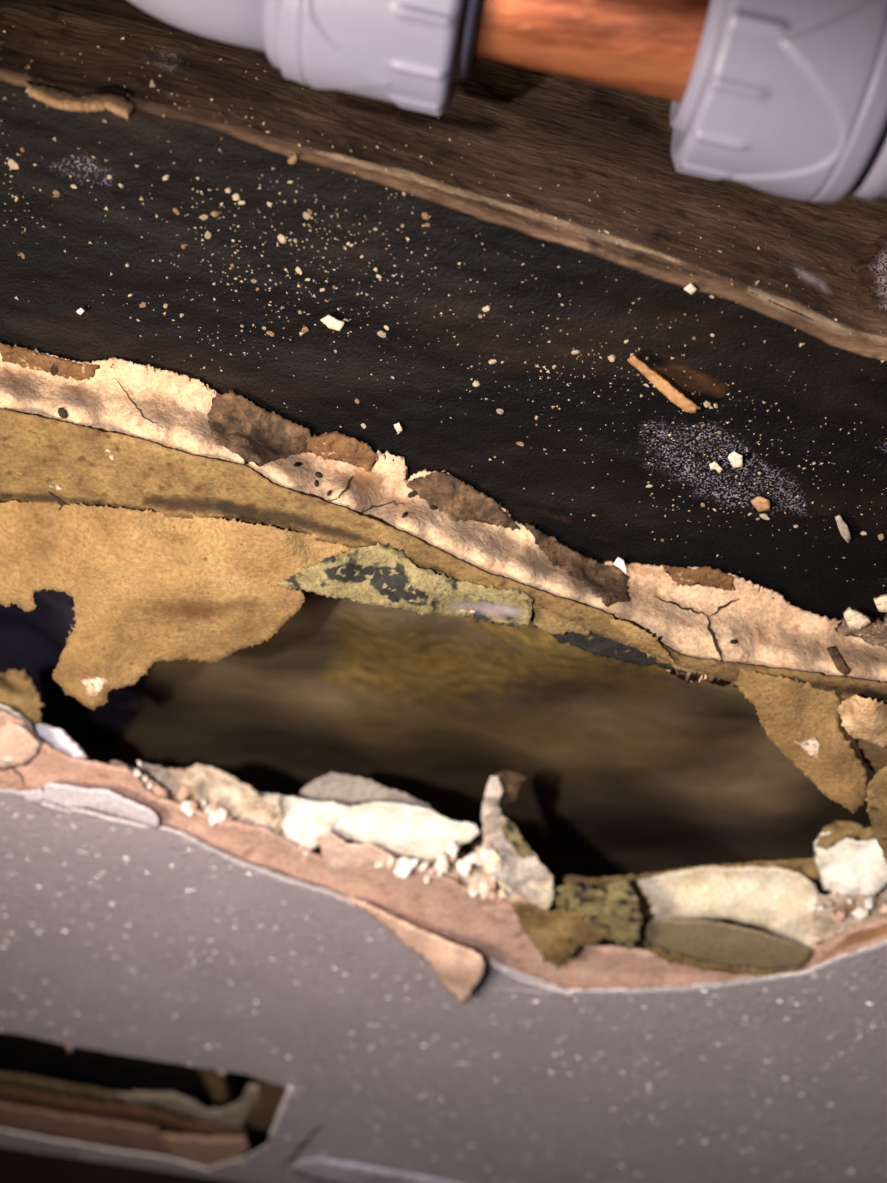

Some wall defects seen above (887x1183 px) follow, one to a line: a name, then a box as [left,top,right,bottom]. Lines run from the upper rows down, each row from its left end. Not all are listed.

spalling [321,314,345,331]
damp [0,82,887,621]
spalling [0,348,887,704]
spalling [0,704,887,1005]
spalling [0,1071,296,1168]